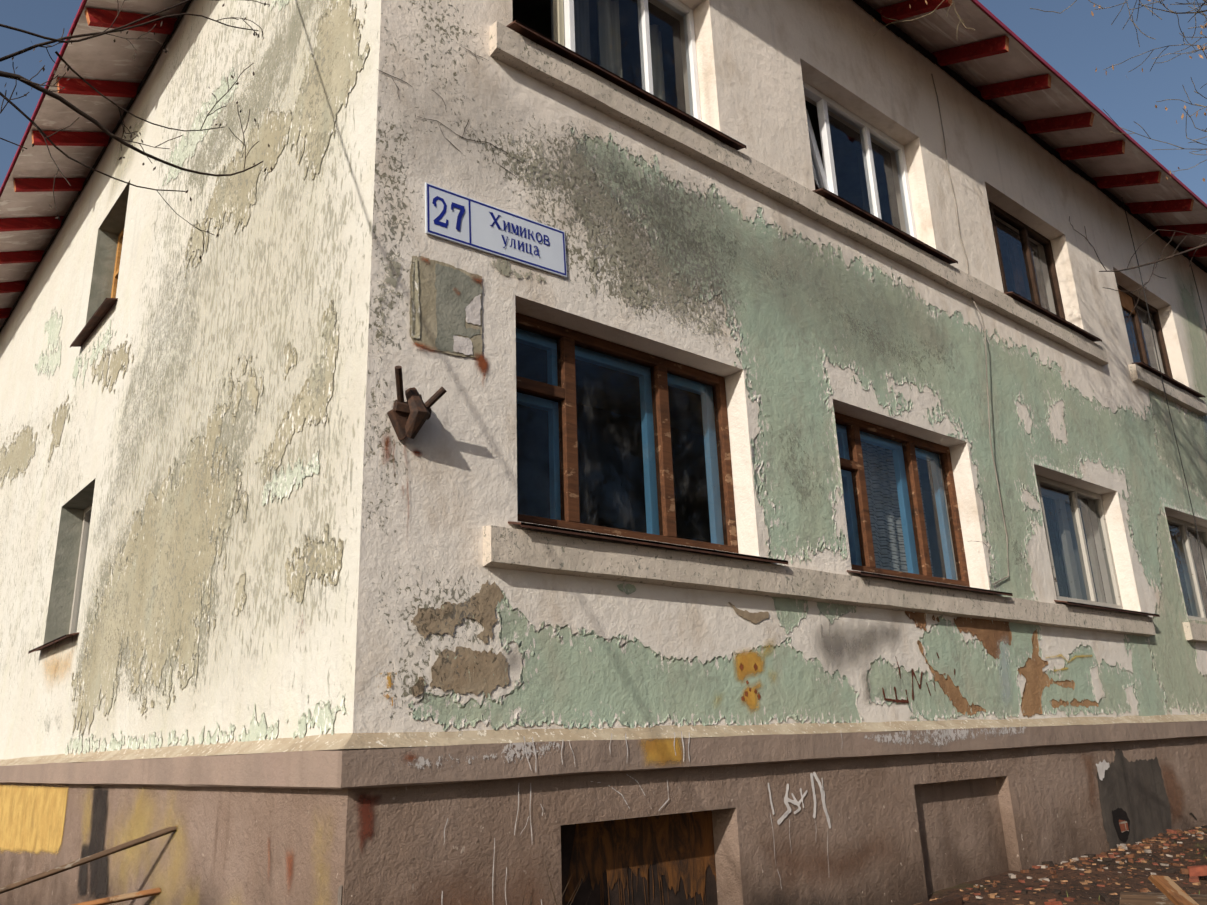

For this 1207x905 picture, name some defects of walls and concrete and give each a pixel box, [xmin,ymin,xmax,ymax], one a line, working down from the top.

peeling [162,67,238,186]
peeling [185,0,369,277]
peeling [64,299,347,755]
peeling [408,127,1207,731]
spalling [1112,808,1130,842]